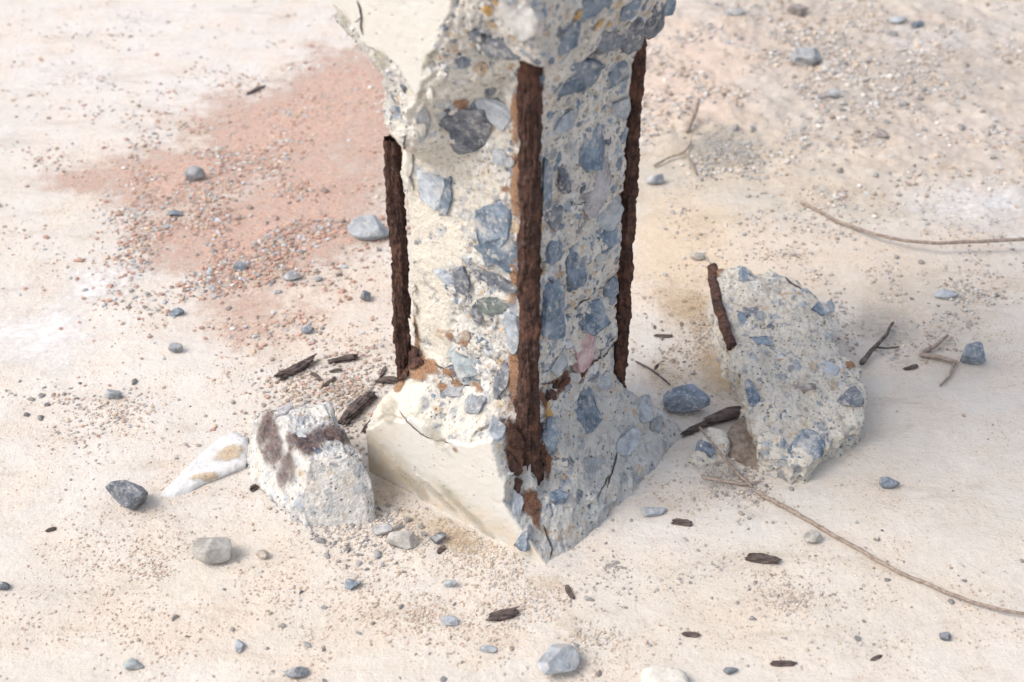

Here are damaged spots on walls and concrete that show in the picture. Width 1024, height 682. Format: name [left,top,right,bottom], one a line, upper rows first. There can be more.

rust [500,92,519,221]
spalling [333,0,683,563]
rust [393,314,483,392]
rust [504,350,542,529]
rust [540,440,553,481]
crack [597,452,618,501]